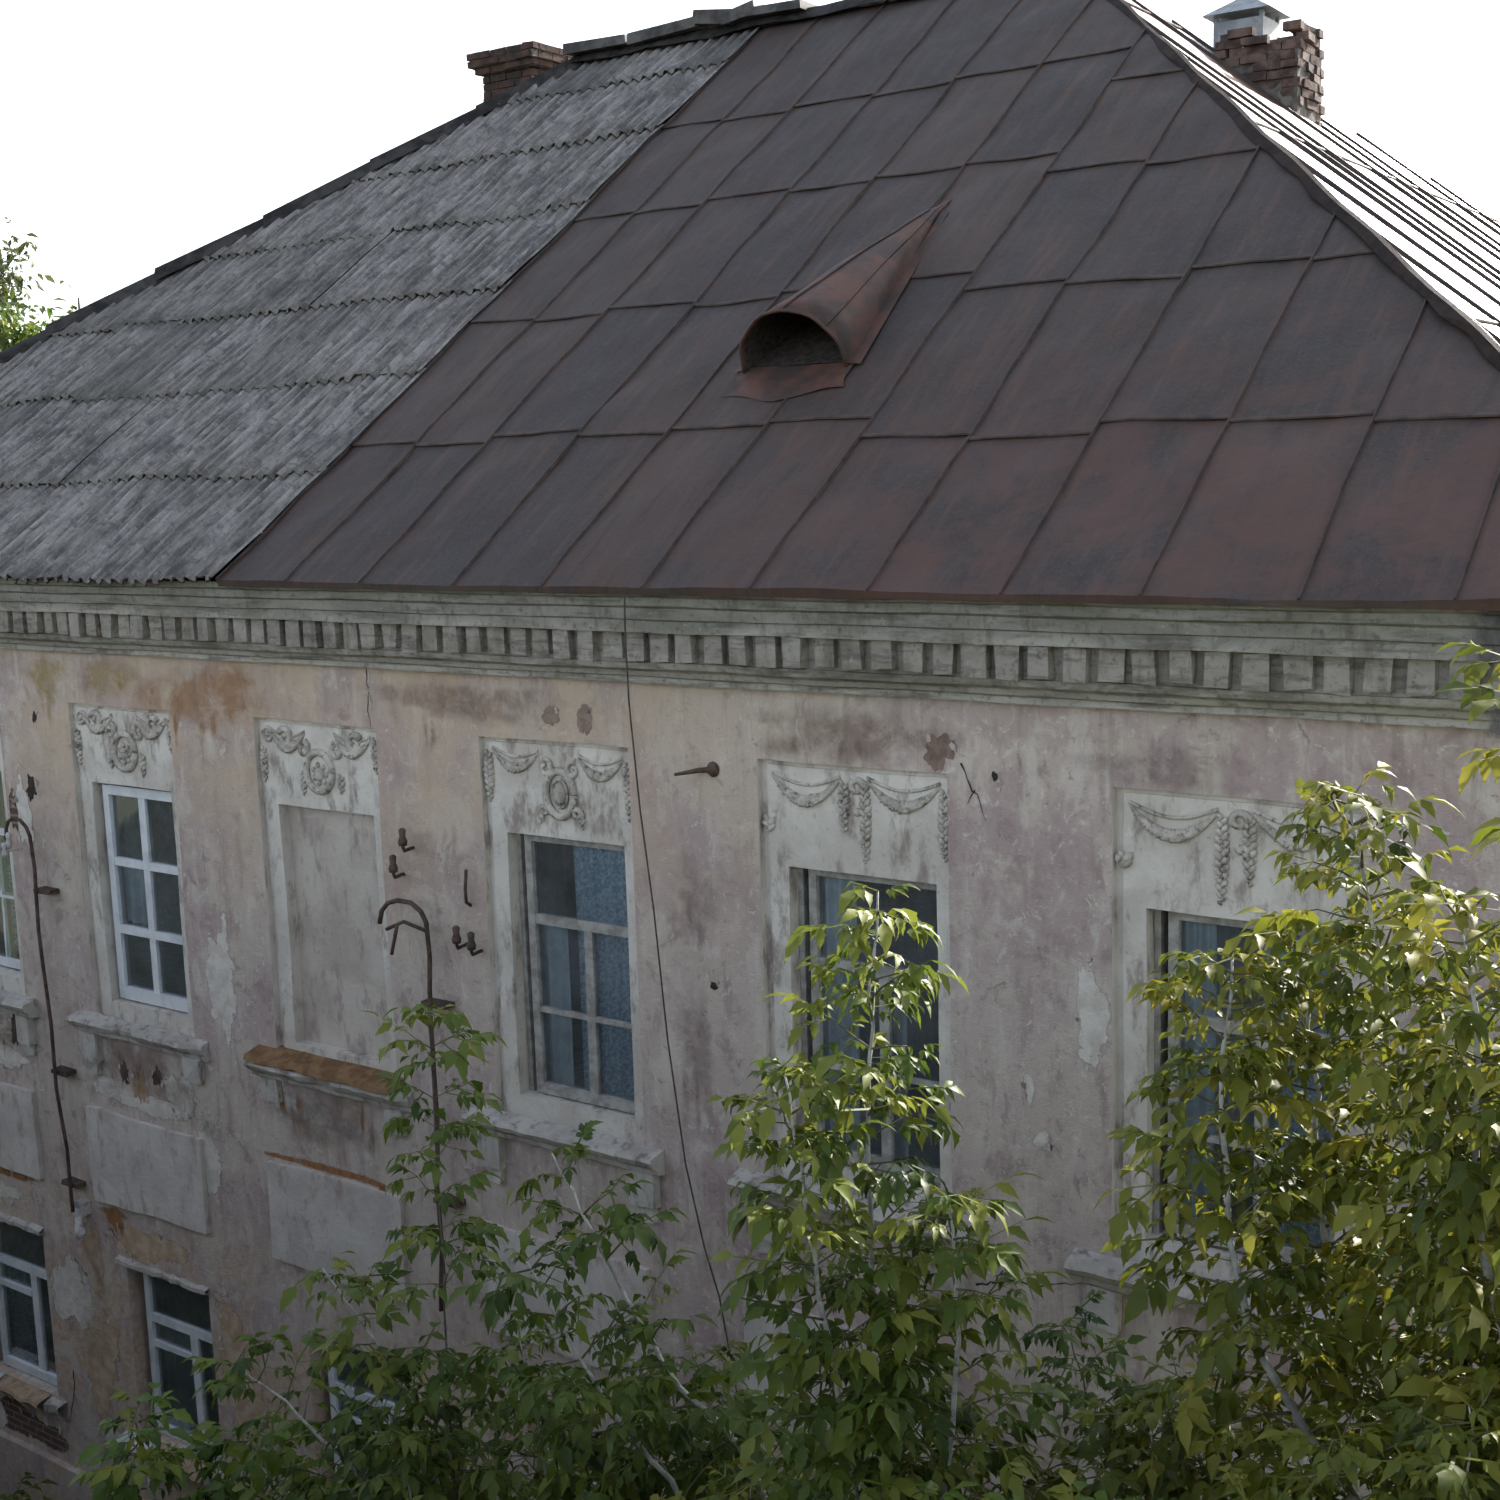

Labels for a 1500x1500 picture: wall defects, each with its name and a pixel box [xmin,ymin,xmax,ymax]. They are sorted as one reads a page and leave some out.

spalling [541,703,592,736]
spalling [923,733,957,772]
flaking render [205,911,237,1048]
flaking render [1075,957,1111,1074]
flaking render [50,1252,97,1332]
flaking render [0,1396,69,1453]